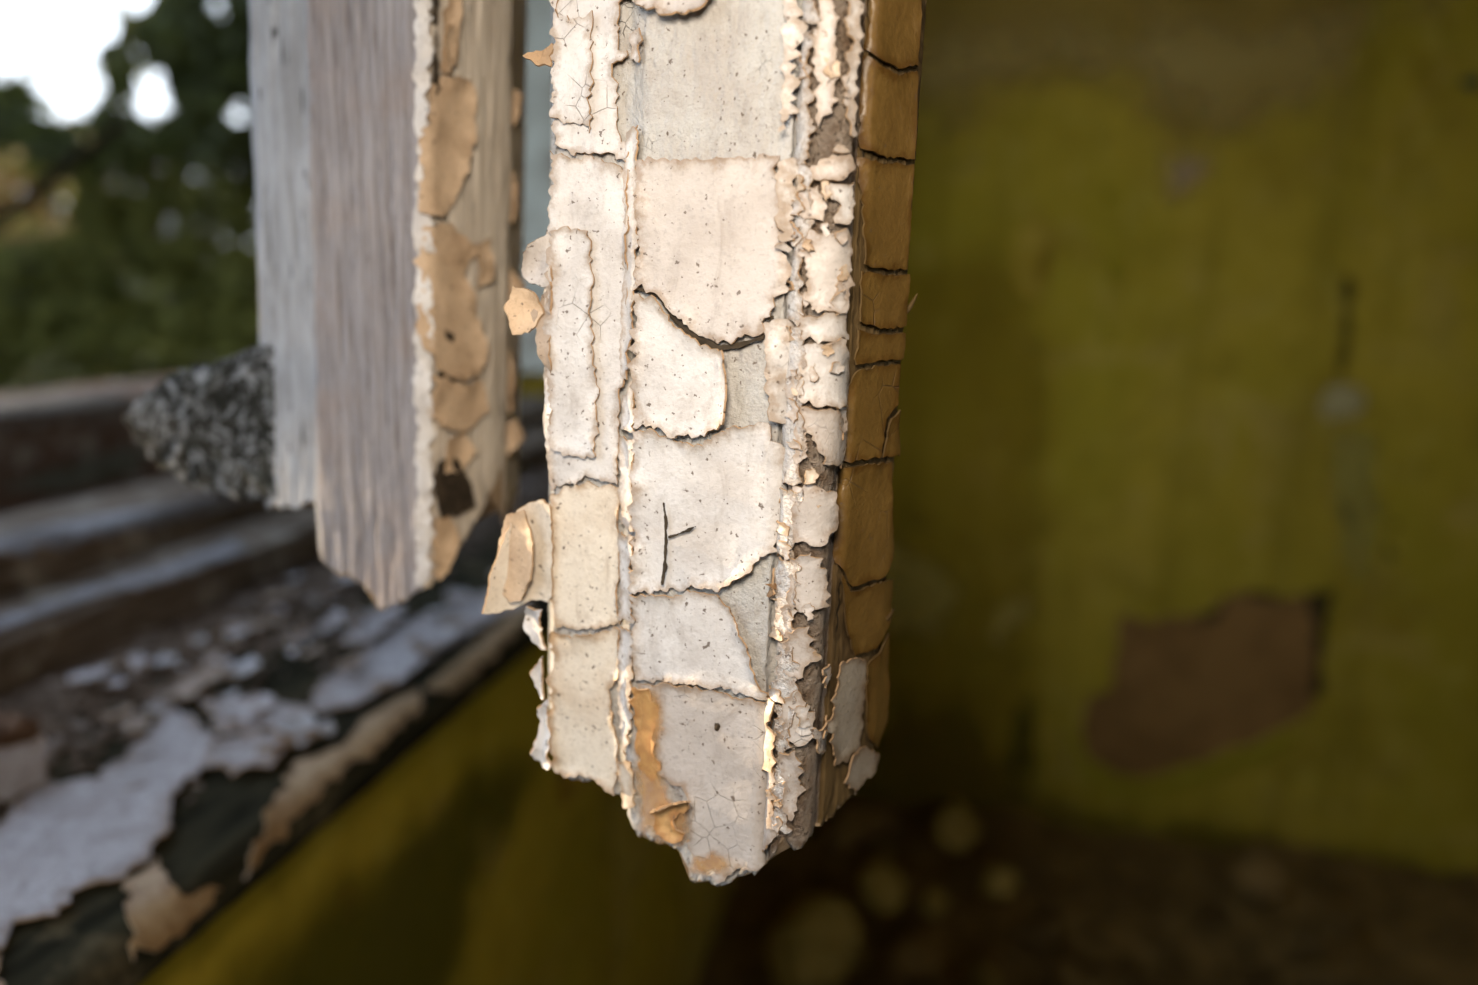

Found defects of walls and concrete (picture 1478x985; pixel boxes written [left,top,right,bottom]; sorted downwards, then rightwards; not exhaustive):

peeling [0,0,922,985]